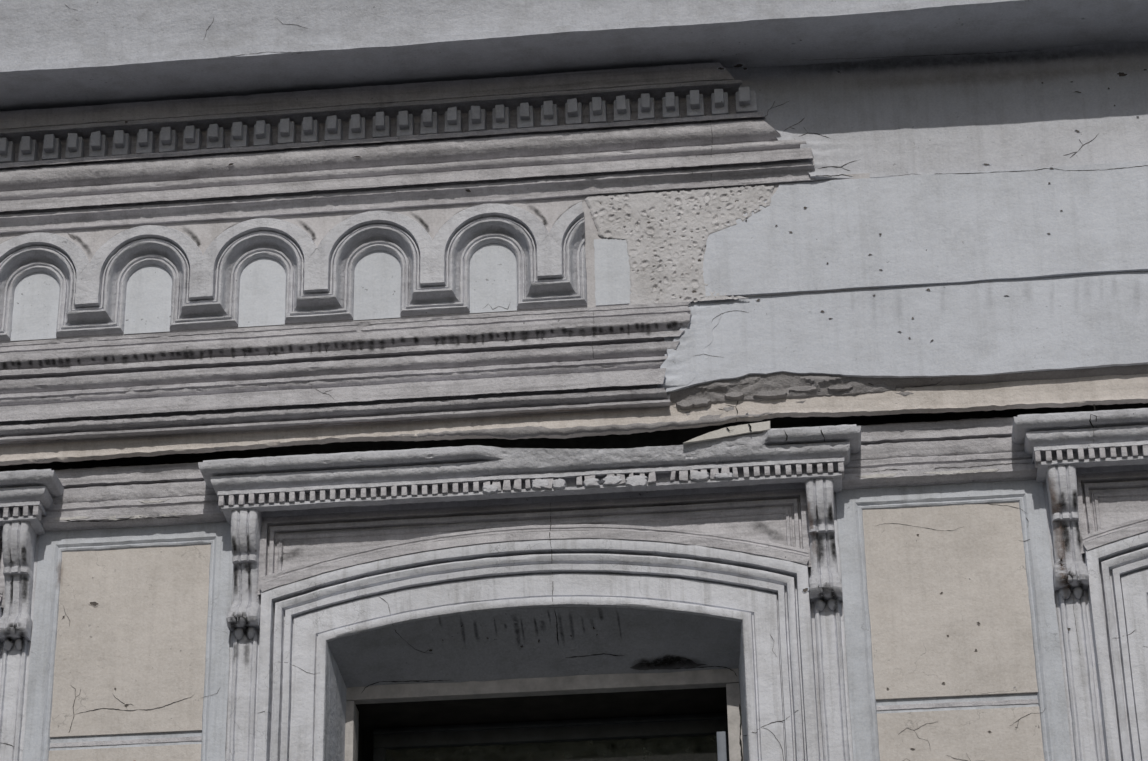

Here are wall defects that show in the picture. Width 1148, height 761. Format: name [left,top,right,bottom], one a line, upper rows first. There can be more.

crack [815,161,854,177]
flaking render [585,185,774,305]
flaking render [672,374,914,420]
peeling [630,656,706,670]
crack [69,687,220,732]